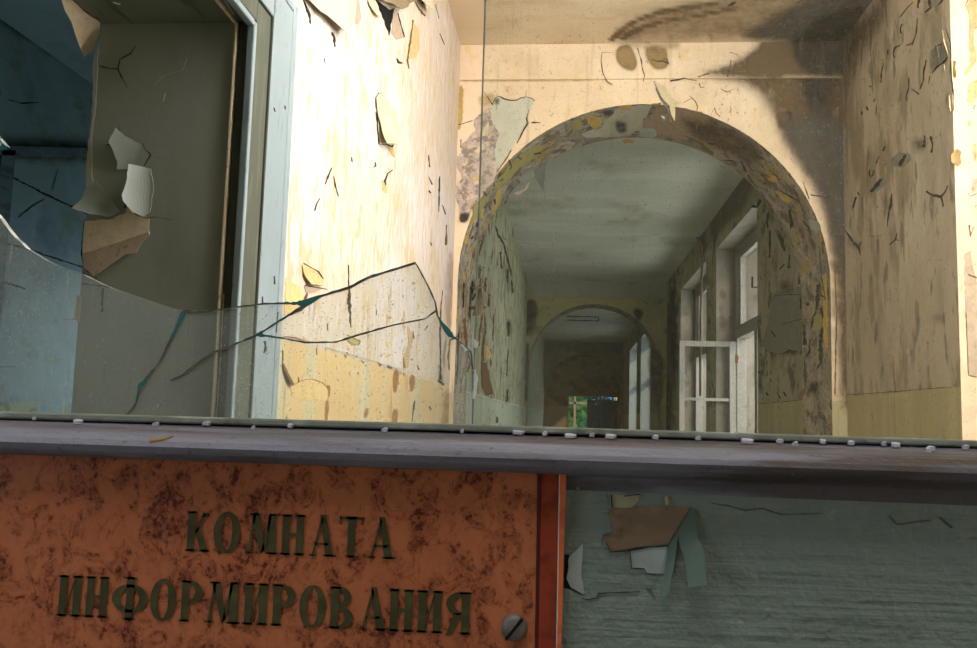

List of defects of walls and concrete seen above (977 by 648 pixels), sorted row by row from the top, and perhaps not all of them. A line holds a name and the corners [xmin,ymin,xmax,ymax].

crack [100,46,136,87]
peeling [292,0,436,69]
peeling [62,0,171,313]
peeling [375,92,409,157]
flaking render [443,96,546,396]
water stain [609,0,883,390]
peeling [274,263,420,375]
water stain [525,300,537,401]
water stain [649,280,677,431]
peeling [564,494,710,600]
crack [711,503,823,515]
crack [889,515,952,529]